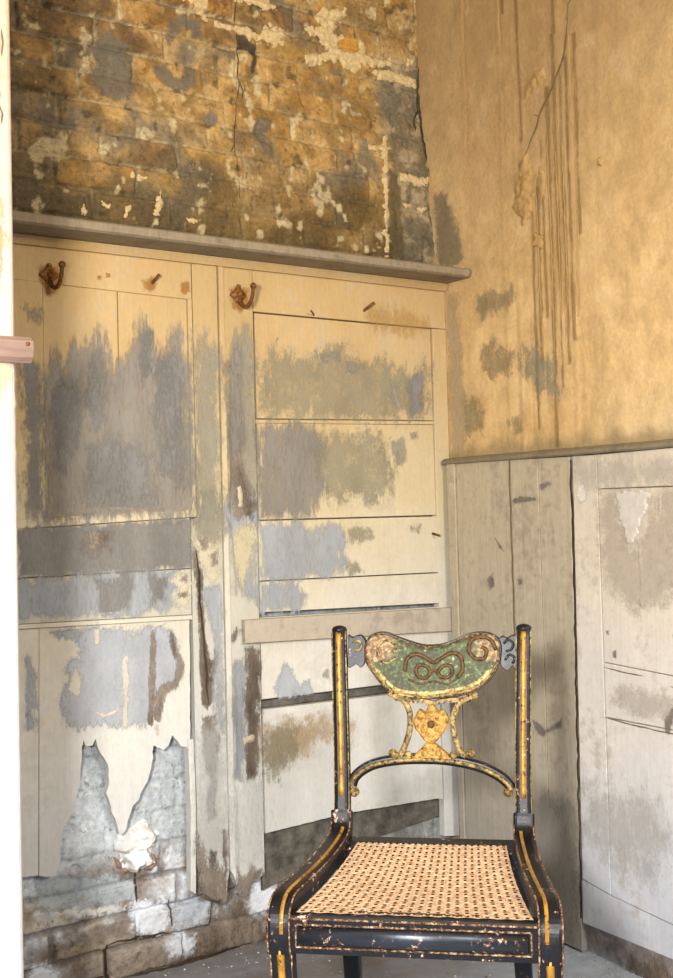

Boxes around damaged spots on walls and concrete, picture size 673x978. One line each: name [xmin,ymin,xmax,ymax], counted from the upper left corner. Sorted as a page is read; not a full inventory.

crack [230,0,244,198]
crack [413,66,429,172]
peeling [615,489,662,608]
peeling [51,624,181,732]